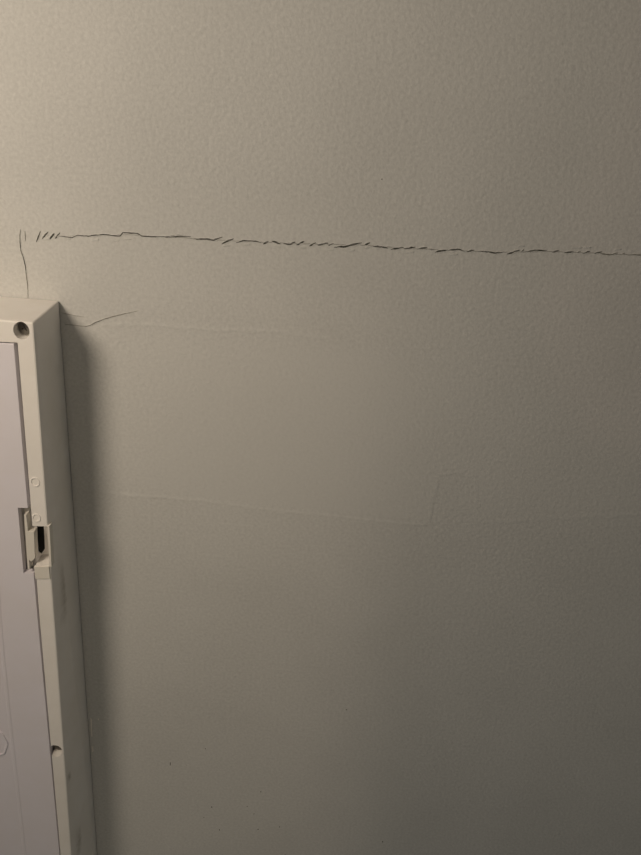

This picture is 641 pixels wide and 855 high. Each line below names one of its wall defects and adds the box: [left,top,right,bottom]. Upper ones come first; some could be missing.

crack [19,229,641,297]
crack [63,311,137,327]